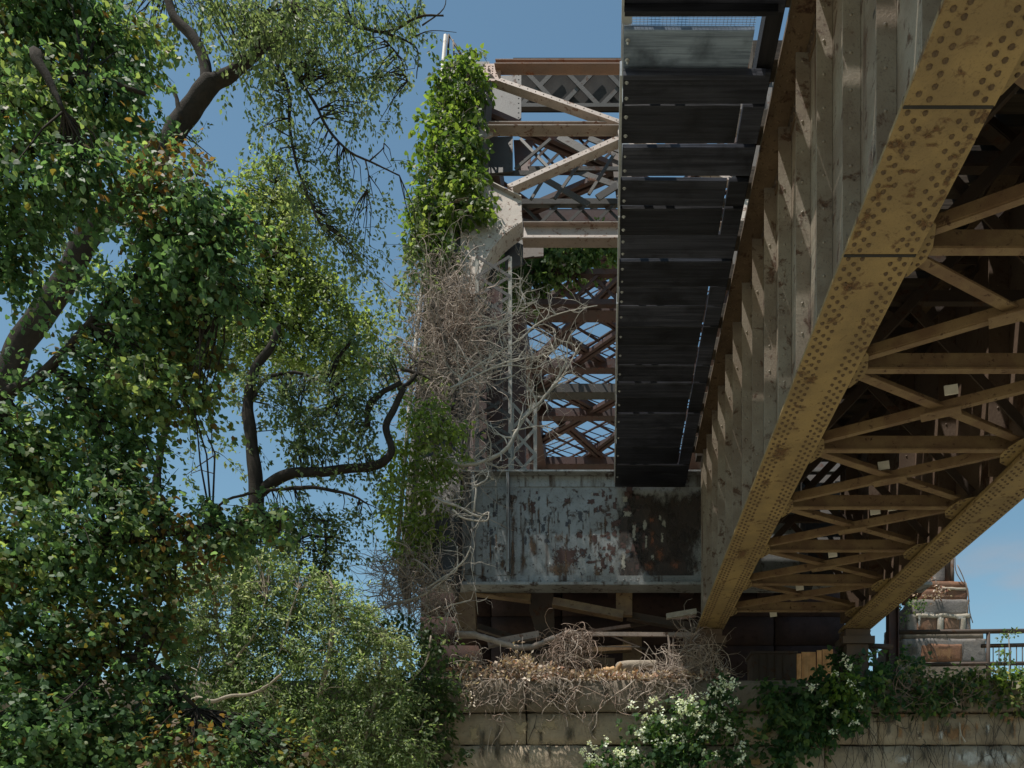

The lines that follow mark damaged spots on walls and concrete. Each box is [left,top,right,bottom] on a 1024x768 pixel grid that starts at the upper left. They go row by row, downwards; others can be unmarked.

rust [482,497,575,577]
peeling [519,487,666,575]
rust [583,491,701,576]